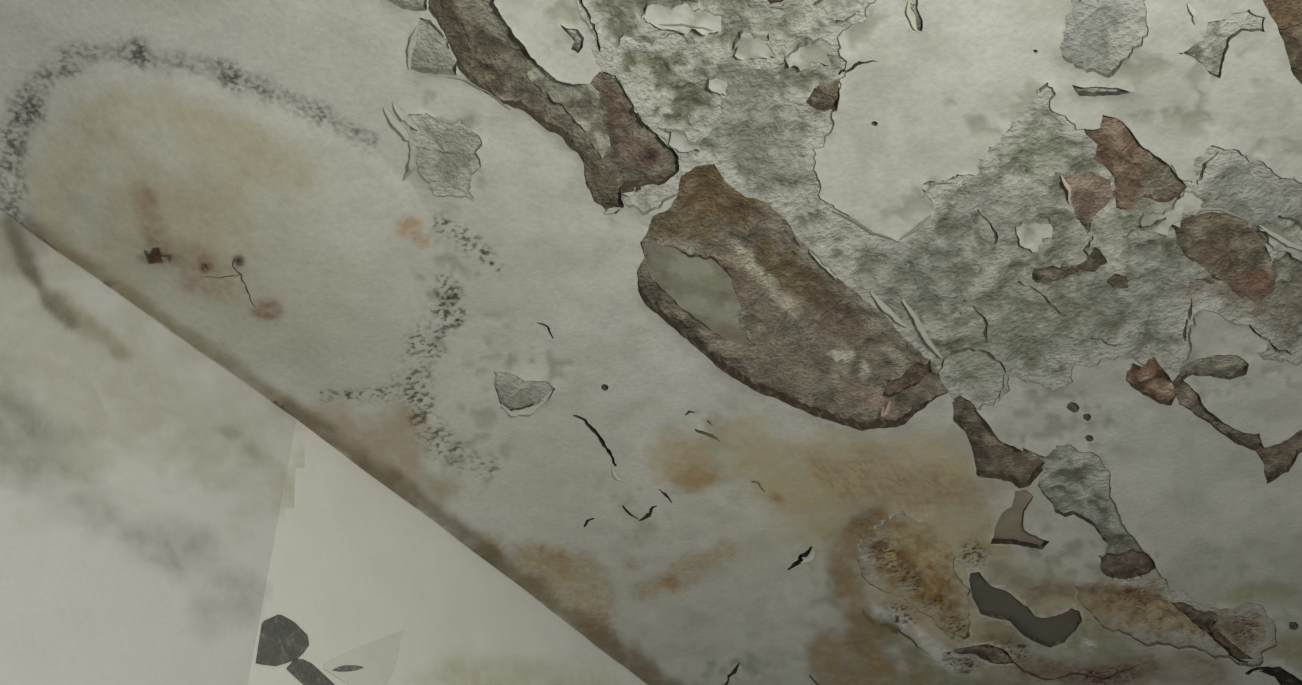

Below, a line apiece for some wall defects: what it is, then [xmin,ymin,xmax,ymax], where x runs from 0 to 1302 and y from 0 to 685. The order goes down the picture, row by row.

peeling [383,101,482,201]
damp [411,283,460,353]
peeling [408,0,1302,685]
crack [573,415,672,527]
crack [788,546,815,570]
peeling [256,614,364,685]
crack [724,663,740,685]
damp [874,607,959,672]